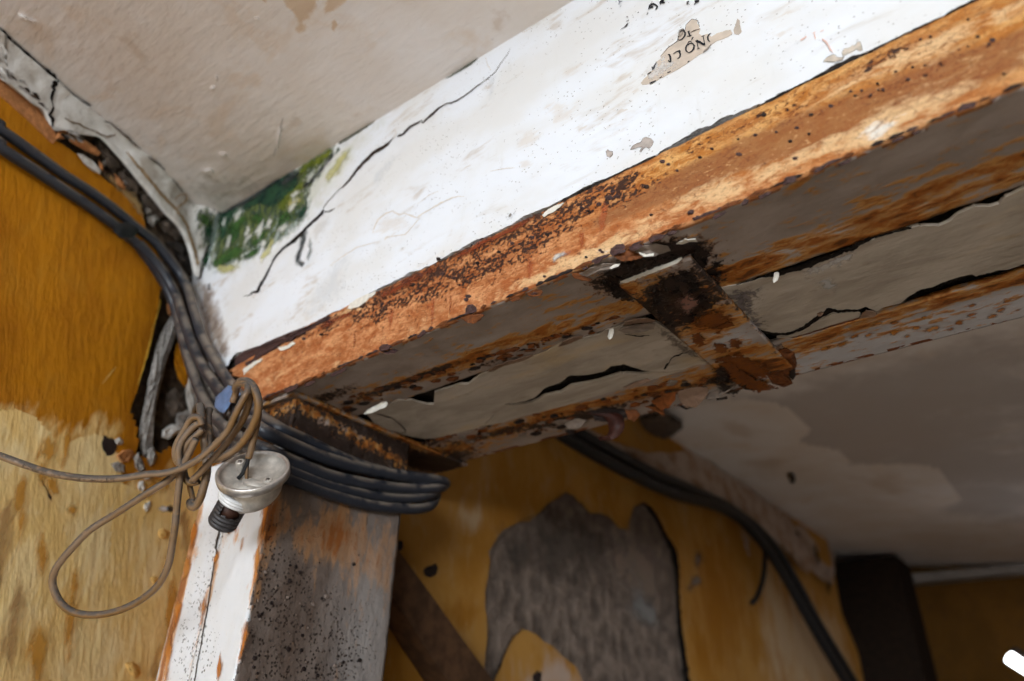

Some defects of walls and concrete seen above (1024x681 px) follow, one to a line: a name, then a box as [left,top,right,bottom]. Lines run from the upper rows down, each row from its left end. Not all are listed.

spalling [0,69,193,284]
water stain [168,97,422,372]
crack [246,55,507,296]
rust [262,152,854,452]
spalling [559,0,978,203]
crack [761,308,877,338]
crack [736,227,912,285]
rust [870,73,1024,147]
water stain [15,480,26,530]
water stain [37,434,70,494]
rust [194,531,230,681]
spalling [484,492,701,681]